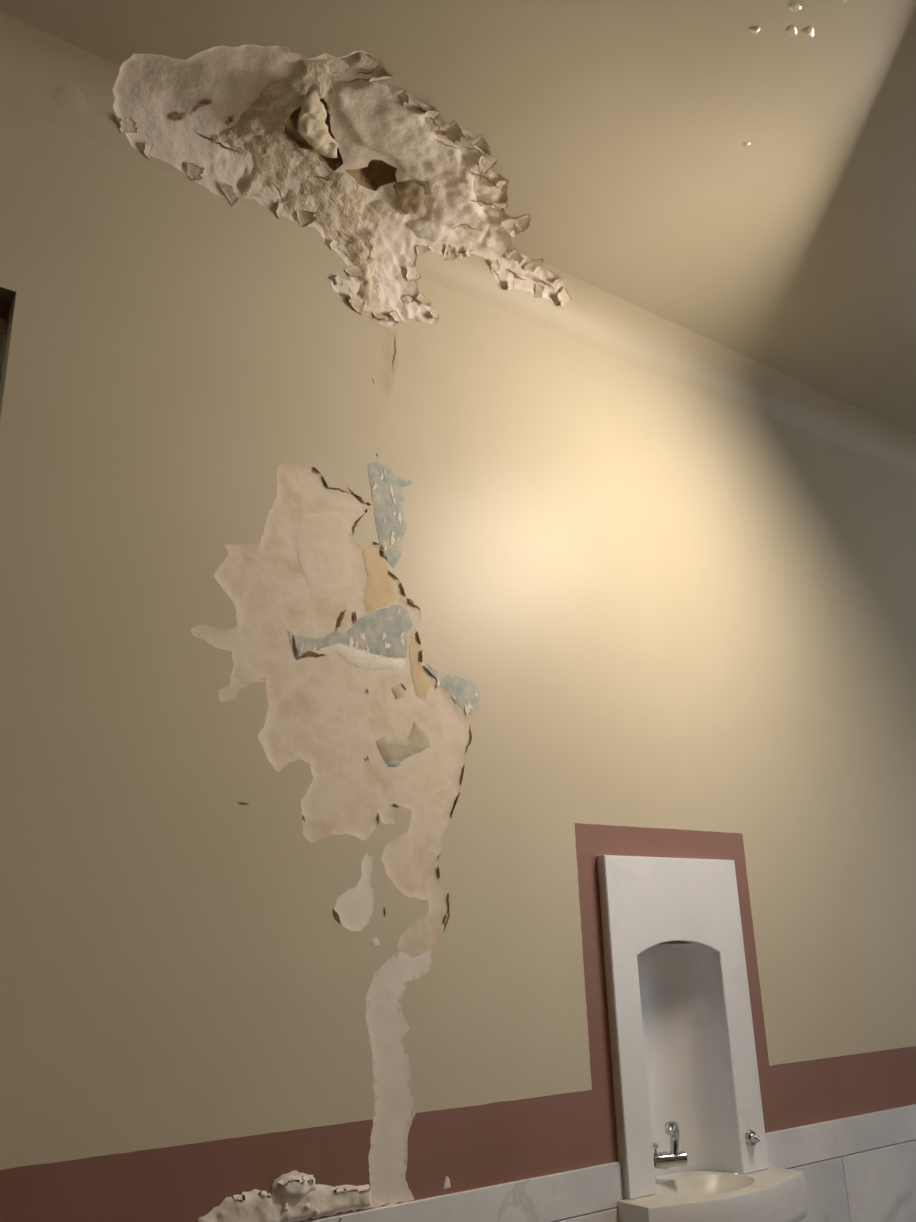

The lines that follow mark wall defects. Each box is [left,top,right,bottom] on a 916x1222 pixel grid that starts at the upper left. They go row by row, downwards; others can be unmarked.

peeling [191,462,480,1222]